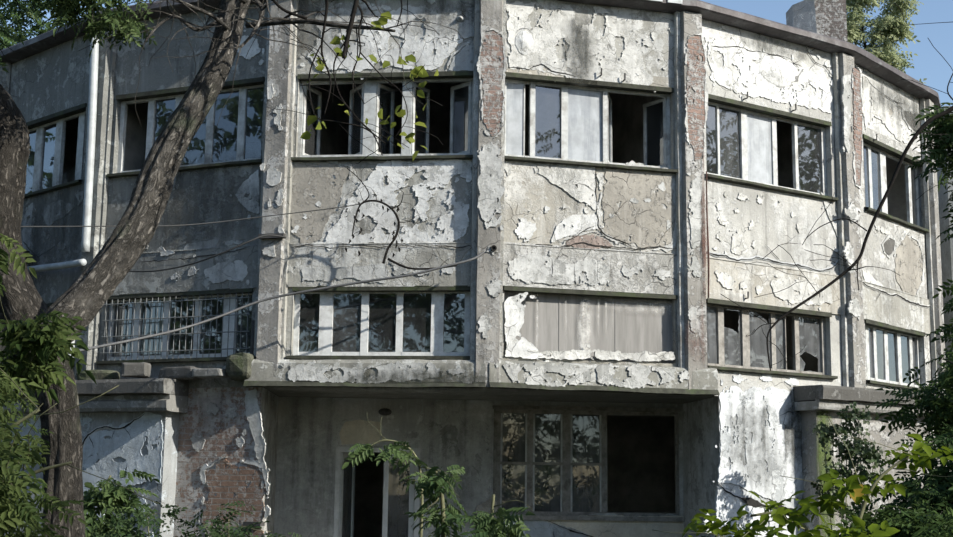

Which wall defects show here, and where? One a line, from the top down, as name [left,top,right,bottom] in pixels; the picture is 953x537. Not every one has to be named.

flaking render [230,0,657,251]
flaking render [672,25,921,287]
flaking render [281,360,472,383]
flaking render [477,313,492,339]
spalling [486,160,690,390]
crack [535,171,677,274]
flaking render [714,270,833,311]
flaking render [847,297,861,321]
spalling [874,225,925,296]
flaking render [82,412,163,521]
spalling [198,389,271,537]
crack [717,483,804,516]